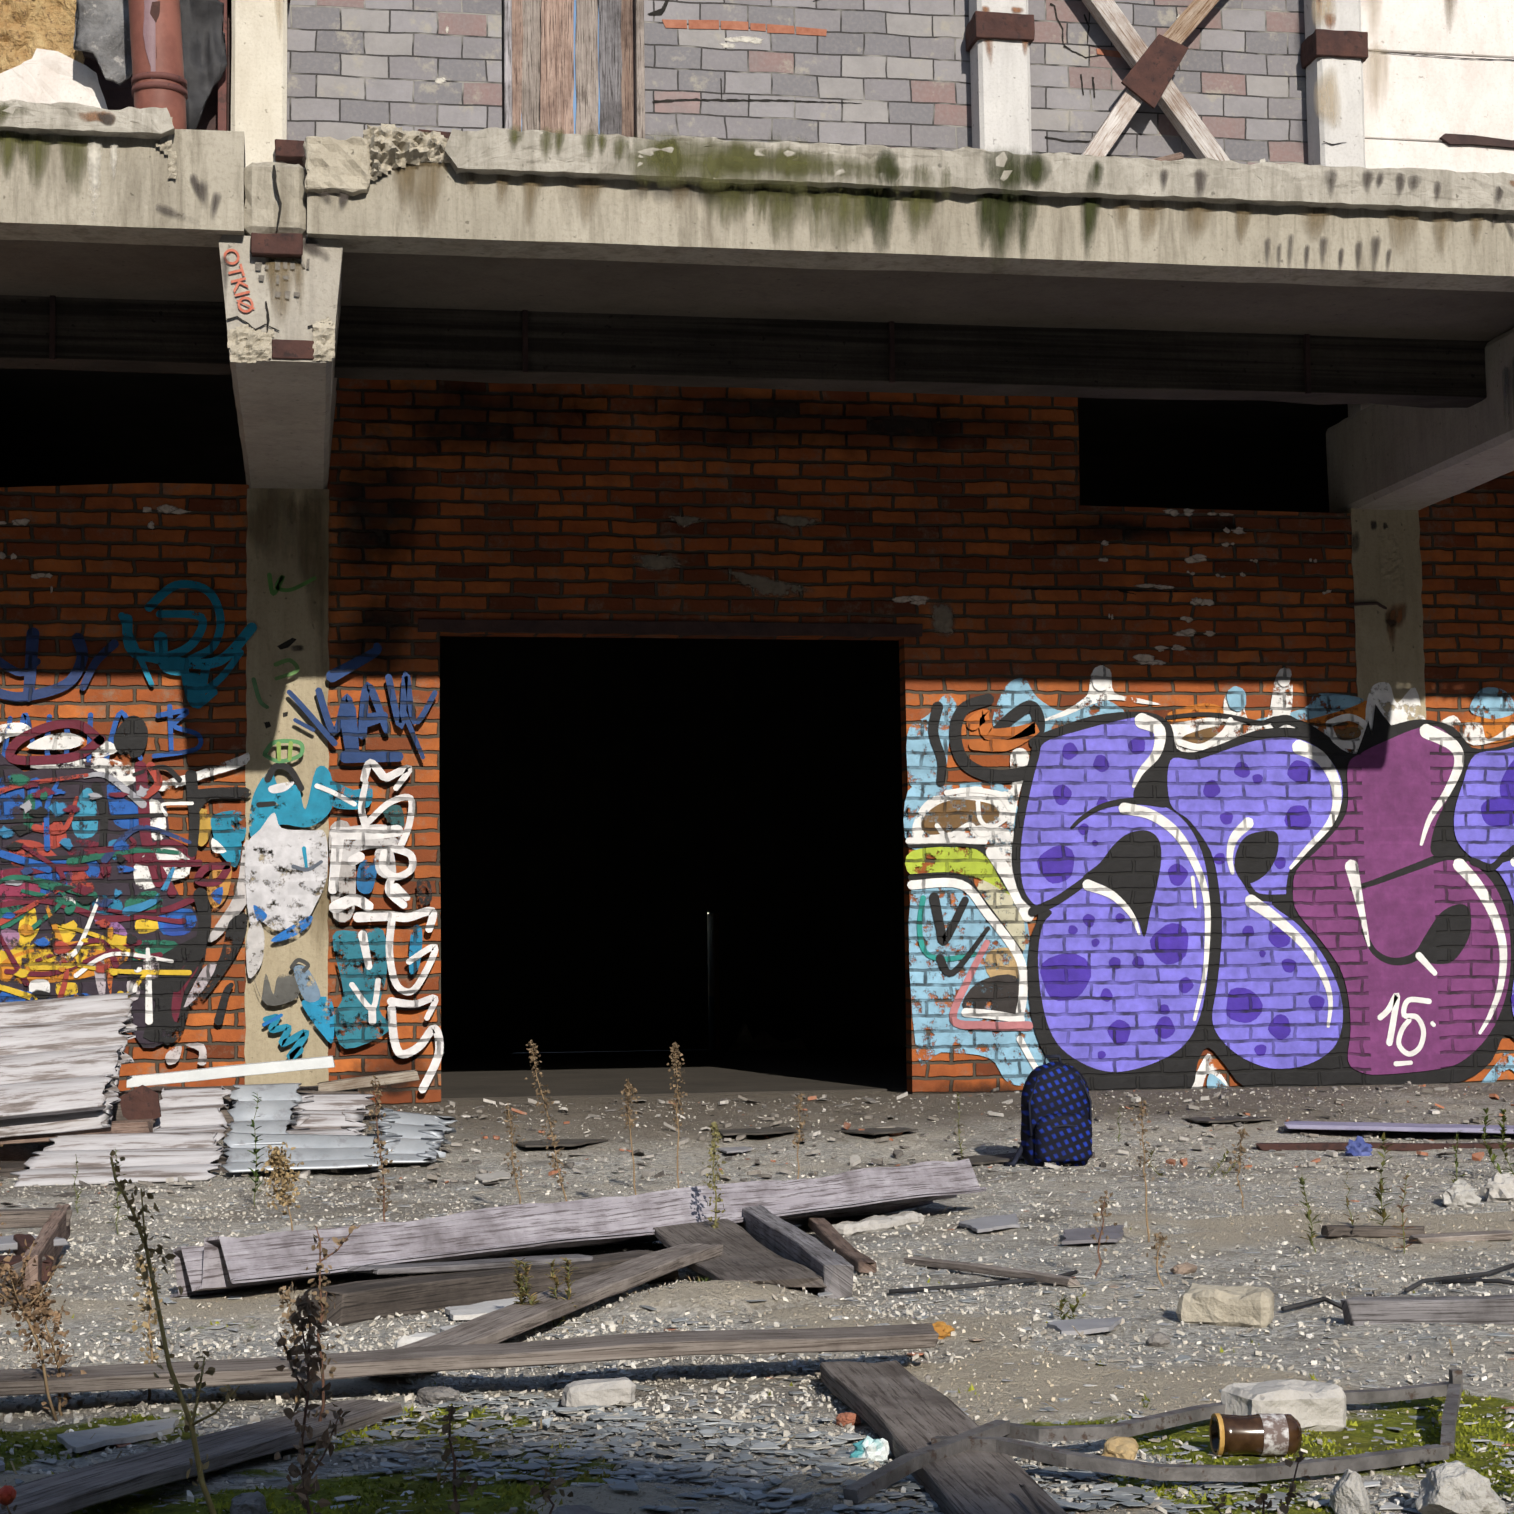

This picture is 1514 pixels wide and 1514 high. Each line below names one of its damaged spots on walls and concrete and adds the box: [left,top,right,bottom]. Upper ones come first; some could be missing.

crack [272,165,282,230]
spalling [303,123,451,196]
water stain [580,178,595,202]
water stain [703,152,934,239]
water stain [978,153,1046,253]
water stain [1084,162,1102,242]
water stain [1193,171,1206,228]
water stain [1267,207,1391,265]
water stain [1365,172,1416,235]
water stain [1474,187,1514,234]
spalling [227,324,274,363]
spalling [312,317,335,361]